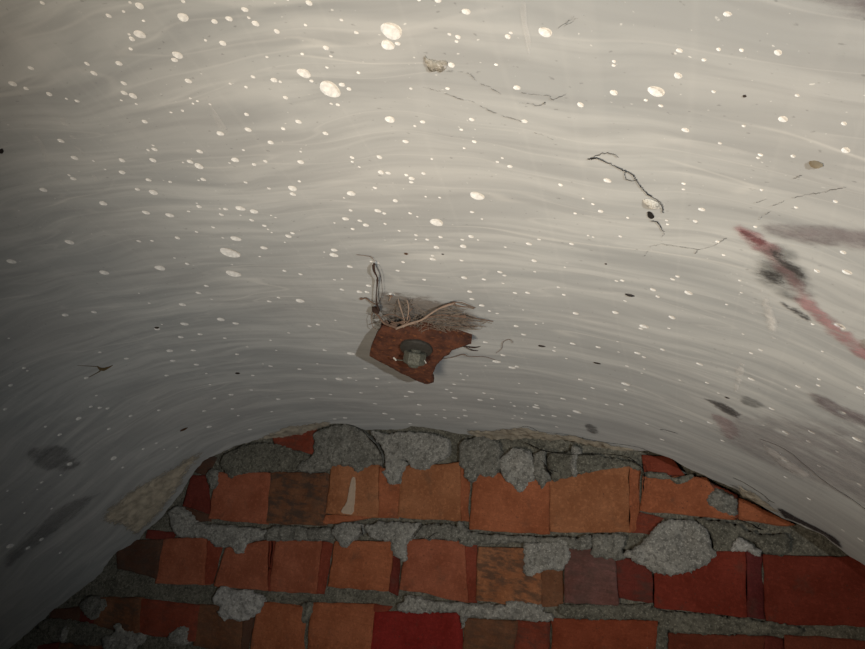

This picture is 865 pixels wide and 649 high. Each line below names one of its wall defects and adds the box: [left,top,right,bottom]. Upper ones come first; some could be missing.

crack [588,152,665,233]
leakage [738,229,803,287]
leakage [784,298,865,359]
leakage [709,400,740,417]
leakage [814,395,865,423]
flaking render [739,487,785,518]
leakage [779,509,841,548]